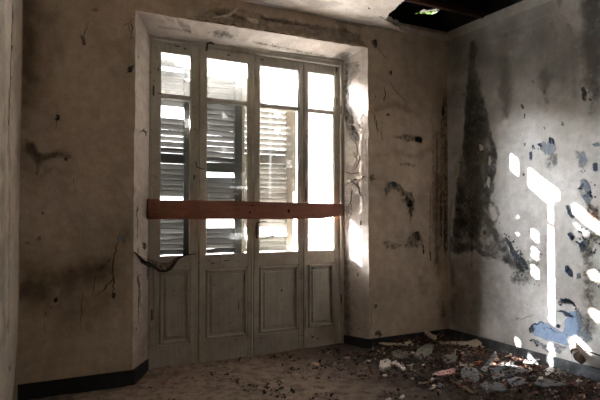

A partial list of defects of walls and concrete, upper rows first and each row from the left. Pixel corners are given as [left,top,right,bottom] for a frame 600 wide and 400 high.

crack [344,172,376,210]
peeling [524,137,557,167]
crack [80,208,139,328]
peeling [529,152,600,353]